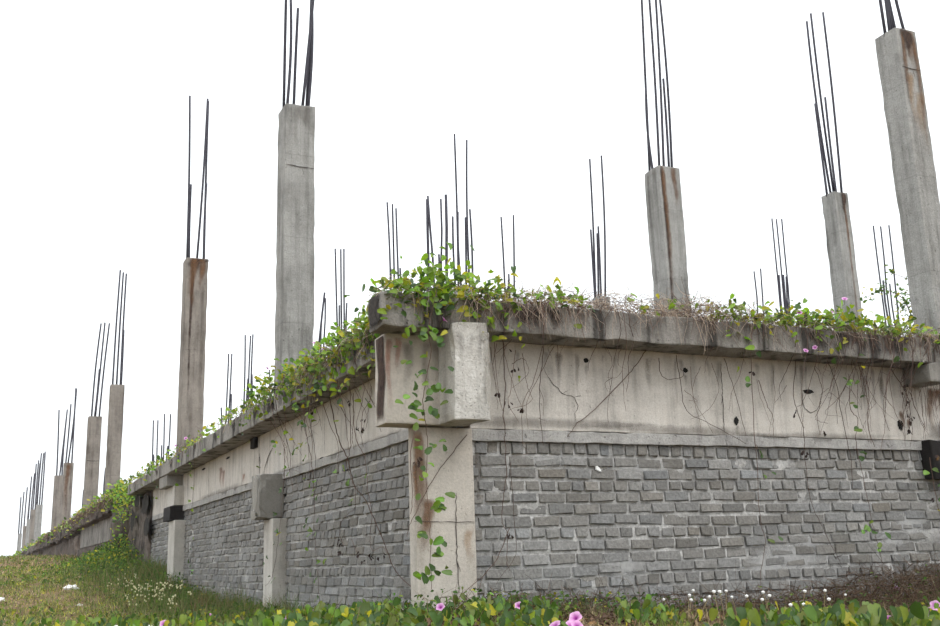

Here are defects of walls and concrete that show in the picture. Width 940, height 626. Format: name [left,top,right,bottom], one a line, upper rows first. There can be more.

corrosion [901,29,921,84]
corrosion [661,166,677,298]
corrosion [376,336,400,419]
corrosion [412,433,434,529]